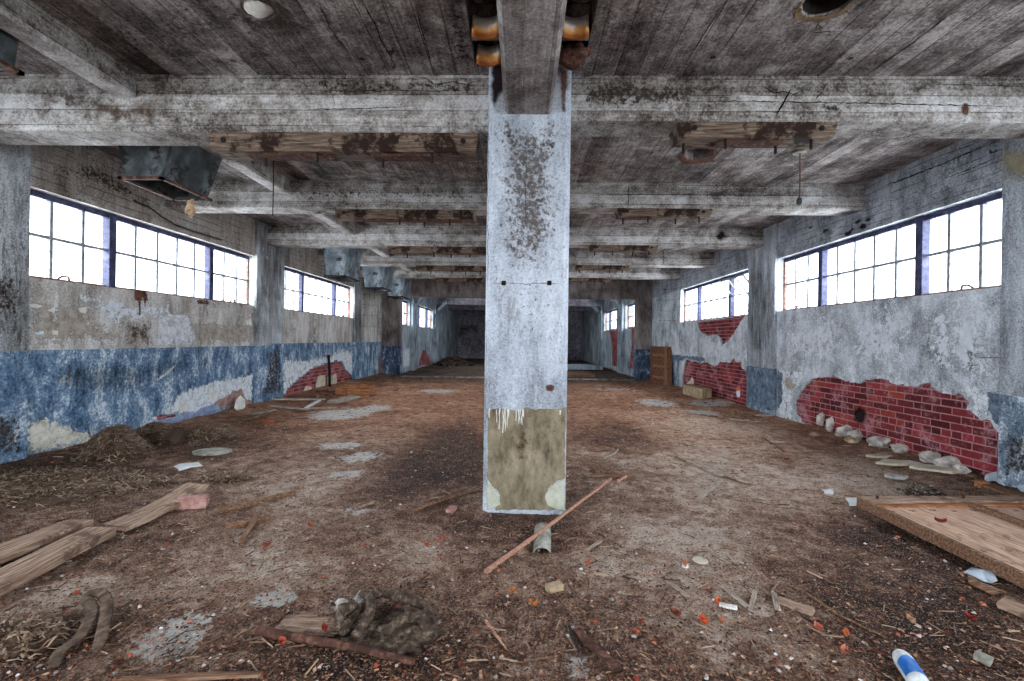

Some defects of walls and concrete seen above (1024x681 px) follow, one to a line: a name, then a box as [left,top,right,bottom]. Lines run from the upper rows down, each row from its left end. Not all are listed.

damp [492,121,570,266]
corrosion [128,290,148,343]
flaking render [283,349,352,396]
flaking render [672,286,1000,476]
damp [486,480,501,510]
damp [545,480,566,511]